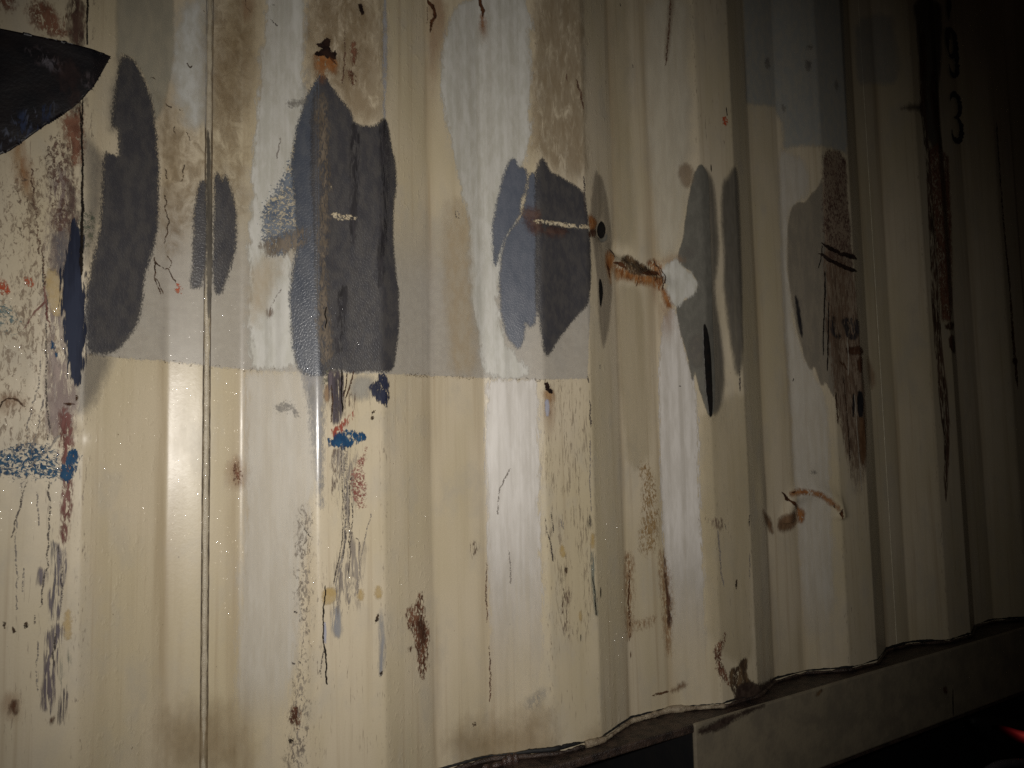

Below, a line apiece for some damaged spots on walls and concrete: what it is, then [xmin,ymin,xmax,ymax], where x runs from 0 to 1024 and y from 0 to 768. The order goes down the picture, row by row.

rust [606,249,671,307]
rust [763,489,844,532]
rust [406,594,430,680]